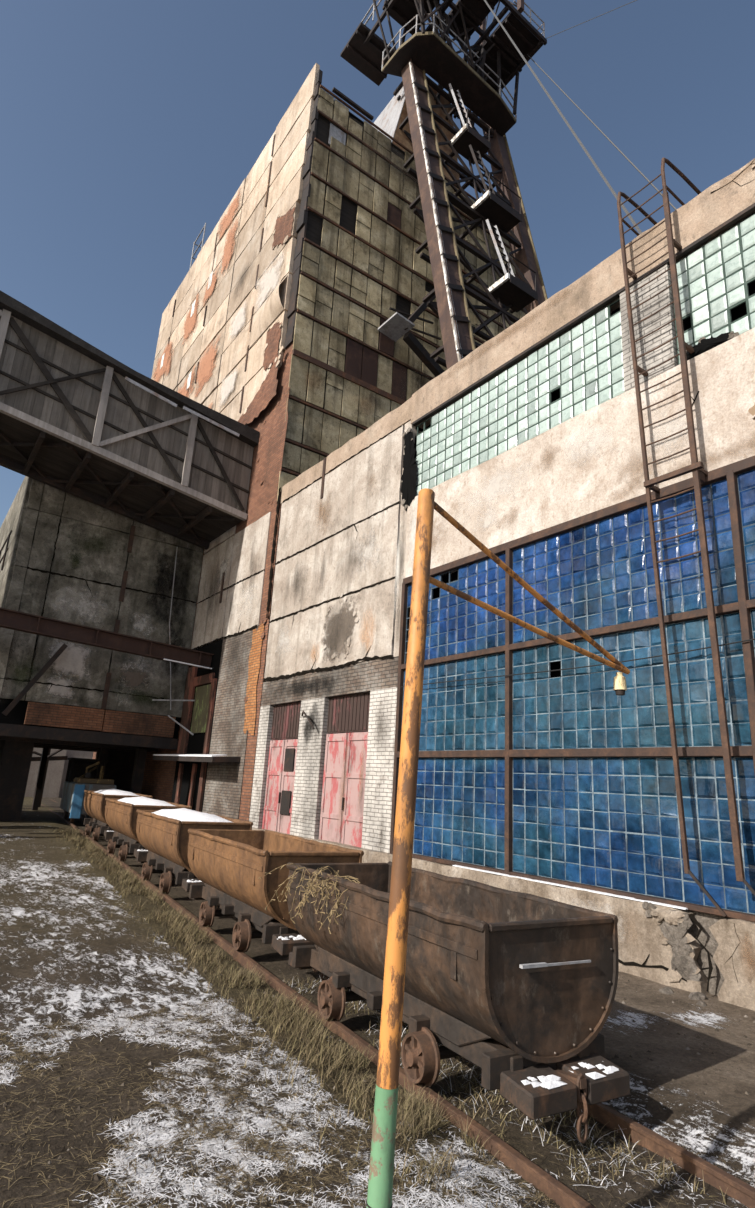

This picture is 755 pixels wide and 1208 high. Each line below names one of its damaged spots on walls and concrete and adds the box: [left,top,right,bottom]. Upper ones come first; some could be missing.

peeling [153,192,239,382]
flaking render [178,207,295,408]
flaking render [238,321,290,504]
spalling [401,427,417,511]
damp [136,556,189,646]
damp [47,642,89,697]
spalling [619,901,701,982]
crack [689,913,740,992]